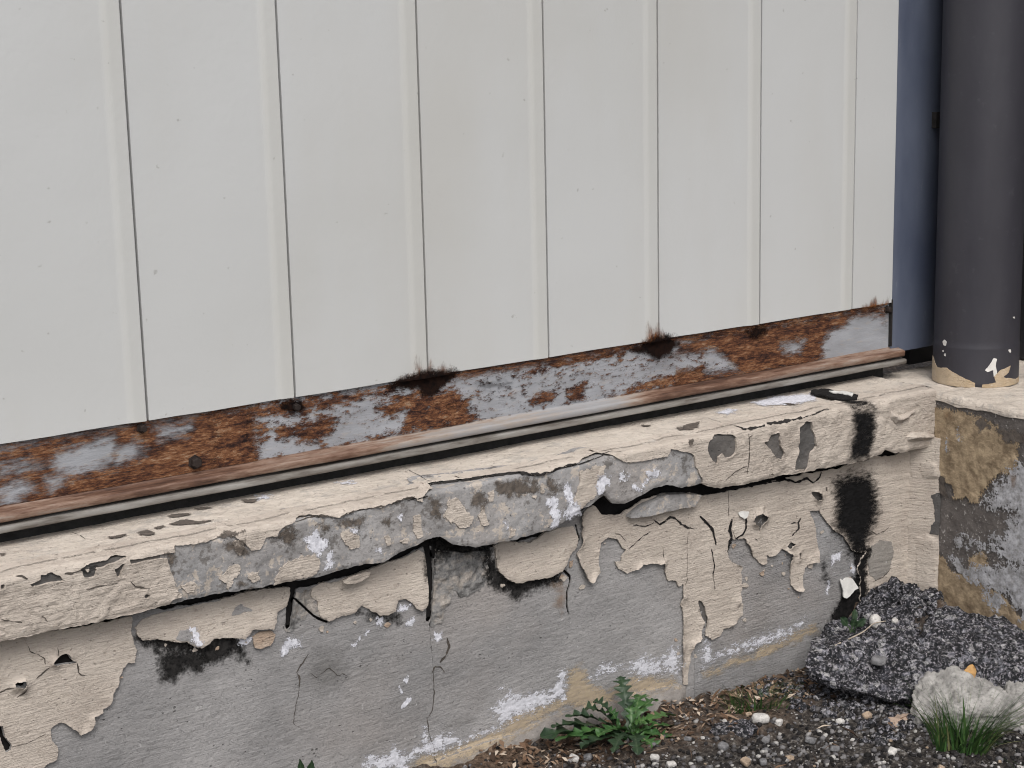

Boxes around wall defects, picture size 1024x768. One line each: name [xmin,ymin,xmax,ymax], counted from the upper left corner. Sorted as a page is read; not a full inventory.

corrosion [0,298,889,507]
damp [843,399,874,408]
peeling [932,340,1019,388]
crack [296,451,620,522]
crack [619,409,829,587]
peeling [929,405,1024,630]
crack [420,539,437,617]
peeling [44,421,894,768]
damp [424,537,562,601]
crack [0,616,85,697]
damp [135,636,252,682]
damp [358,616,817,768]